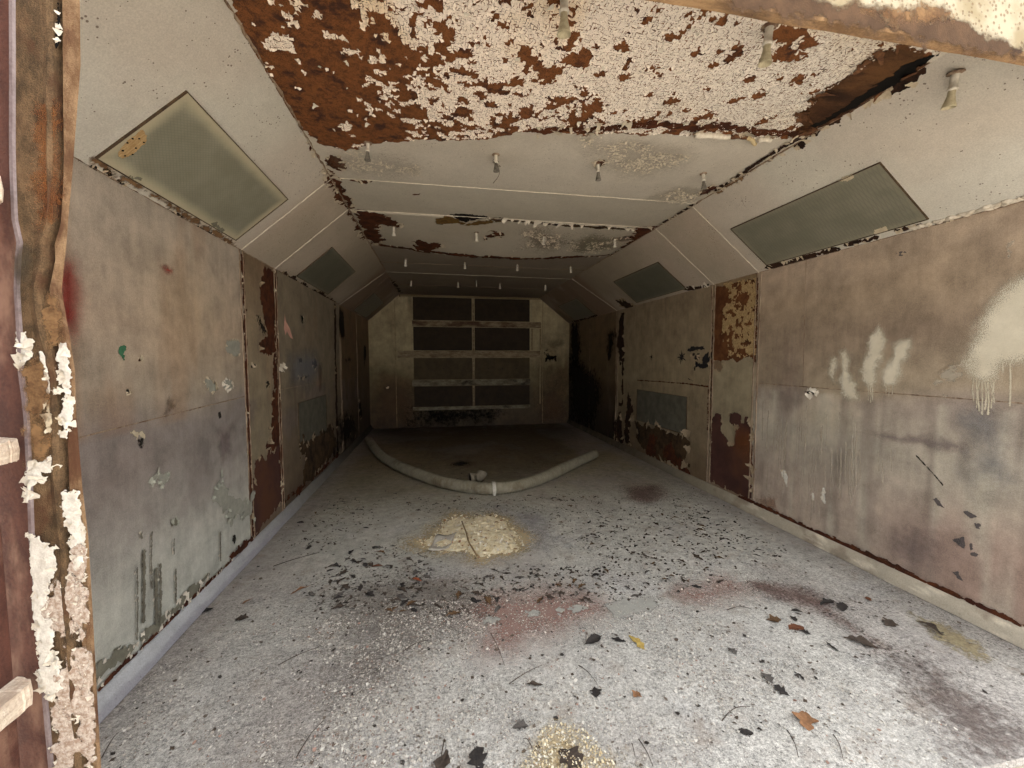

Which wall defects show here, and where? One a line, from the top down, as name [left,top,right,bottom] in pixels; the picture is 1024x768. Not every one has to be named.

peeling [232,0,940,240]
peeling [489,217,637,255]
peeling [684,277,757,380]
peeling [11,331,77,503]
peeling [265,381,282,454]
peeling [710,412,756,498]
water stain [972,361,1012,415]
water stain [134,531,177,640]
peeling [25,489,978,768]